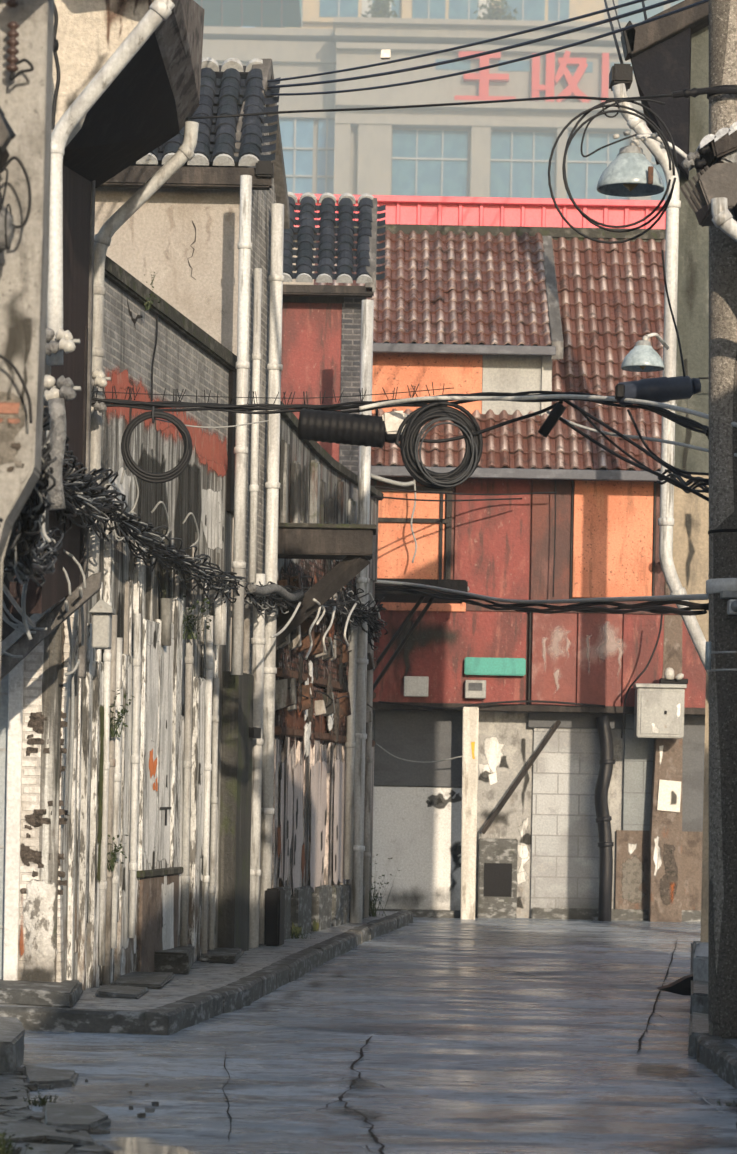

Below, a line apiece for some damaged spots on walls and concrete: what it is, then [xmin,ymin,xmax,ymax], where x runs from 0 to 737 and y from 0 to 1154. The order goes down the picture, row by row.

leakage [105,0,152,41]
crack [188,221,196,280]
spalling [0,391,27,471]
peeling [105,369,228,550]
leakage [117,594,134,654]
spalling [279,559,336,615]
peeling [586,623,623,664]
spalling [275,611,349,893]
peeling [478,736,508,785]
crack [637,938,678,1053]
crack [222,1051,239,1140]
crack [316,1036,391,1154]